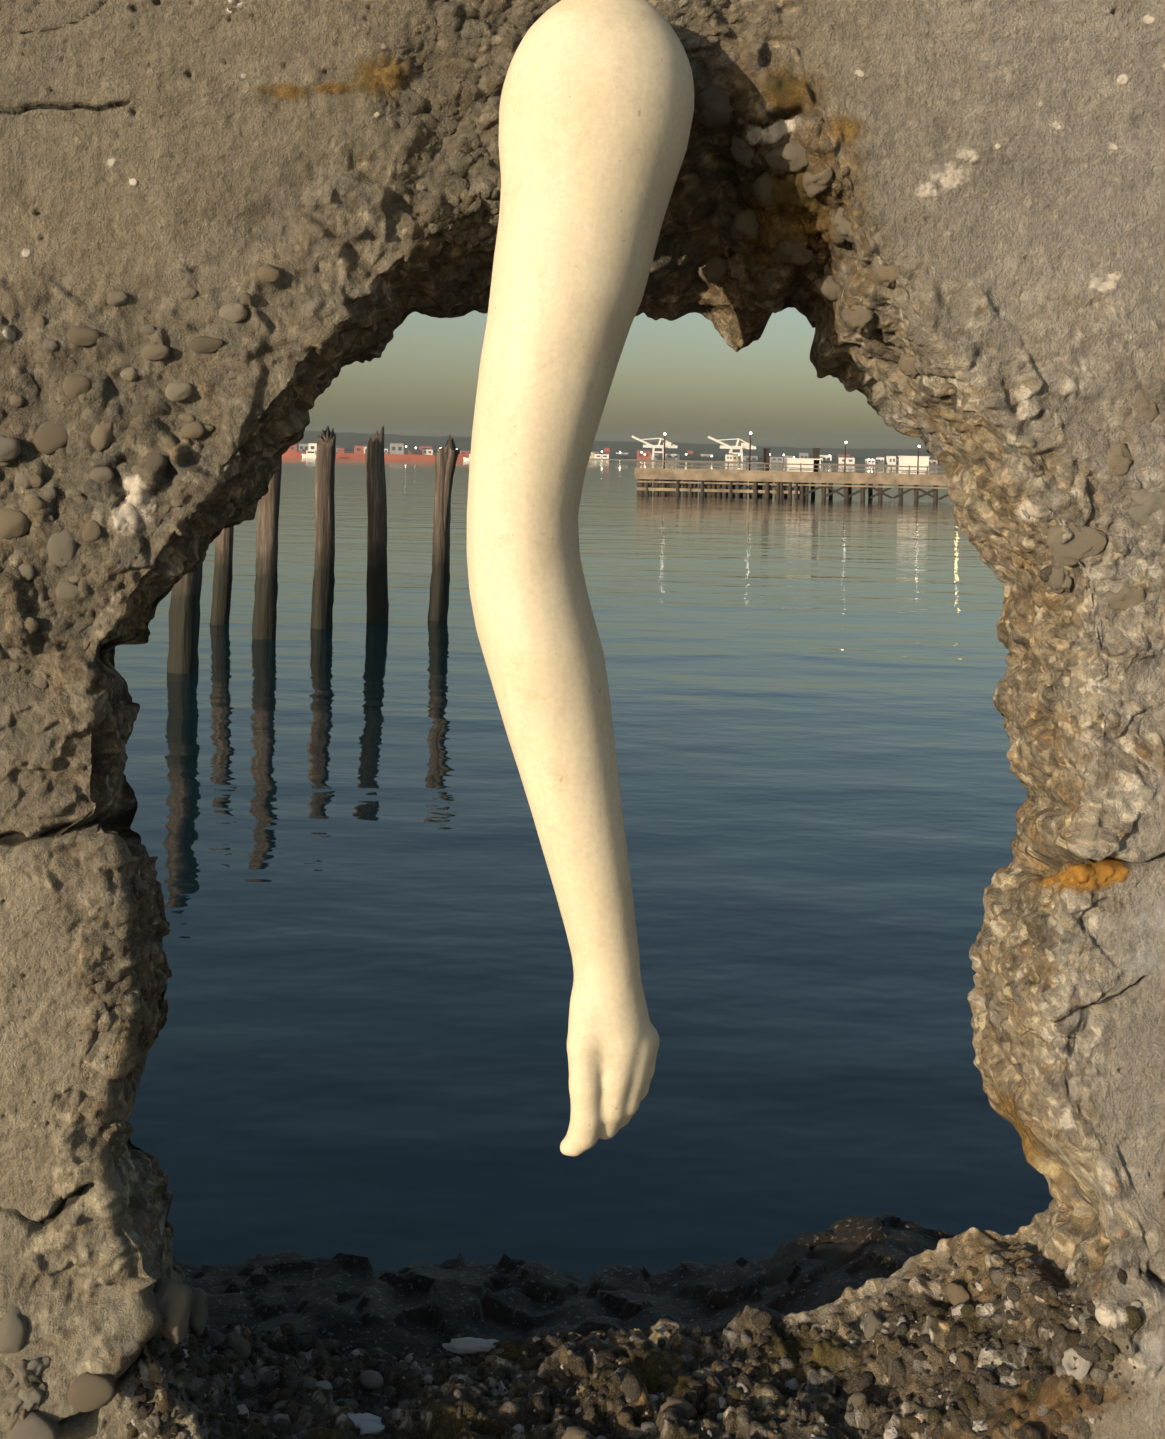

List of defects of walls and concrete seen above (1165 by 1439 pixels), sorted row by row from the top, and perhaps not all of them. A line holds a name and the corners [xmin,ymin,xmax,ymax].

spalling [646,0,745,54]
crack [0,101,130,115]
spalling [385,0,561,262]
peeling [914,150,979,198]
spalling [693,86,875,334]
peeling [1086,270,1122,292]
crack [0,815,131,847]
spalling [972,499,1085,1126]
spalling [69,869,172,1154]
crack [39,1184,88,1226]
crack [1140,1269,1165,1288]
peeling [1093,1299,1148,1329]